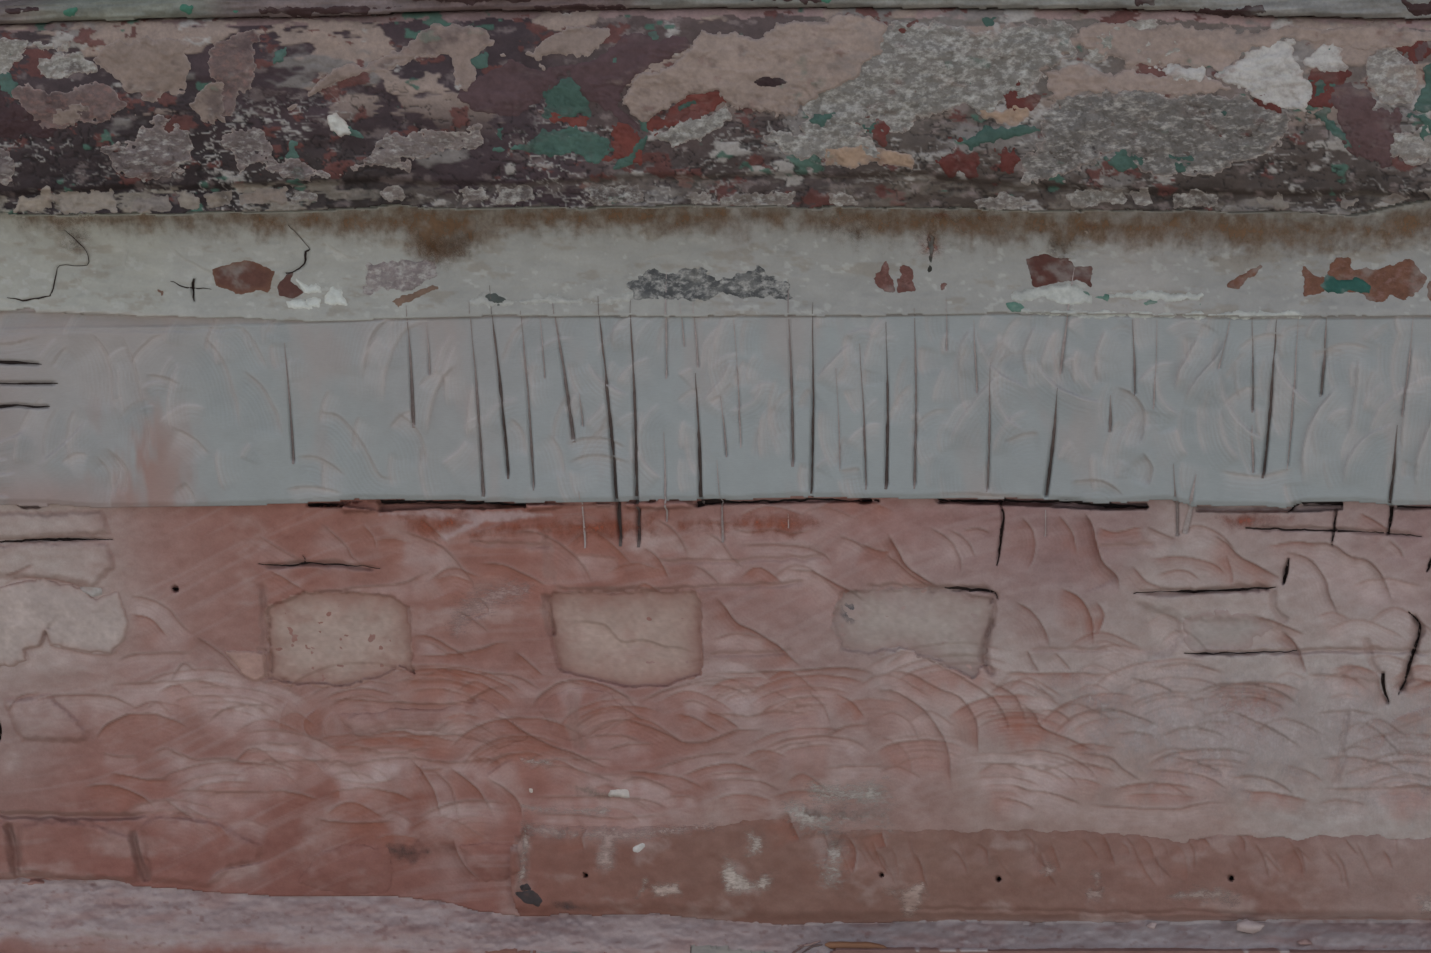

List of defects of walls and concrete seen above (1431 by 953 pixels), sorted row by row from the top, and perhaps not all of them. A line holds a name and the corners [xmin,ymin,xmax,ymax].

peeling [413,0,629,71]
peeling [0,23,614,215]
peeling [622,0,1431,210]
peeling [588,184,644,206]
spalling [212,260,348,310]
spalling [363,259,438,307]
spalling [1011,254,1431,321]
crack [0,536,113,544]
crack [1133,502,1431,594]
crack [1184,648,1297,656]
crack [1381,612,1421,702]